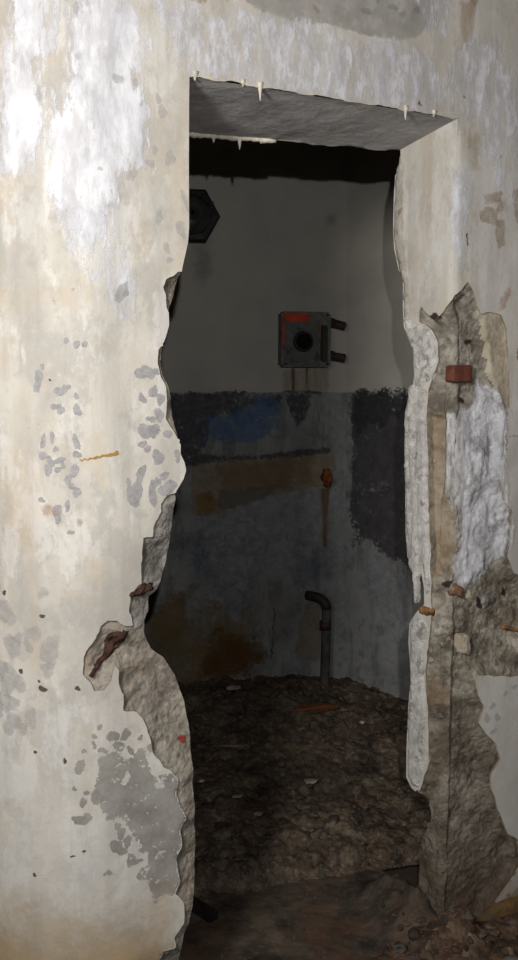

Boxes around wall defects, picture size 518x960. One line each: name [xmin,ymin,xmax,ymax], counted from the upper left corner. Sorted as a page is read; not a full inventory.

water stain [0,0,157,319]
spalling [163,272,180,310]
water stain [155,0,518,199]
water stain [449,167,472,272]
spalling [346,154,518,918]
spalling [63,346,333,960]
water stain [0,935,163,960]